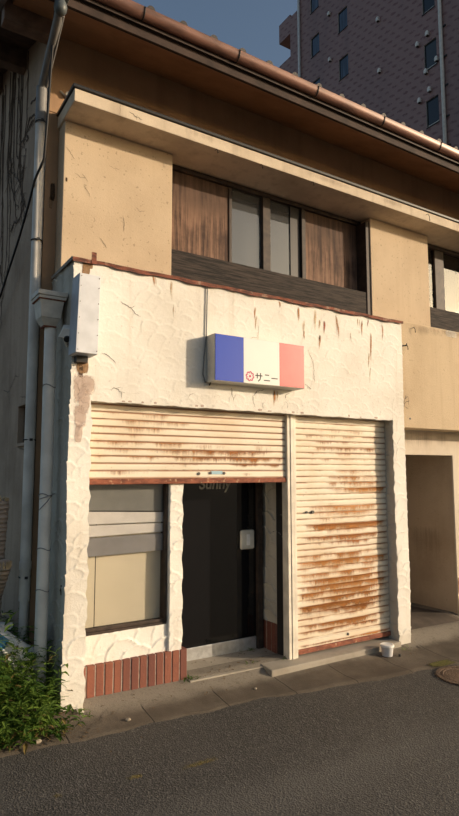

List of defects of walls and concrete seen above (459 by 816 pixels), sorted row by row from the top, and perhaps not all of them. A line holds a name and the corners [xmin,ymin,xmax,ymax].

rust [156,443,280,466]
rust [331,471,383,492]
rust [301,504,387,647]